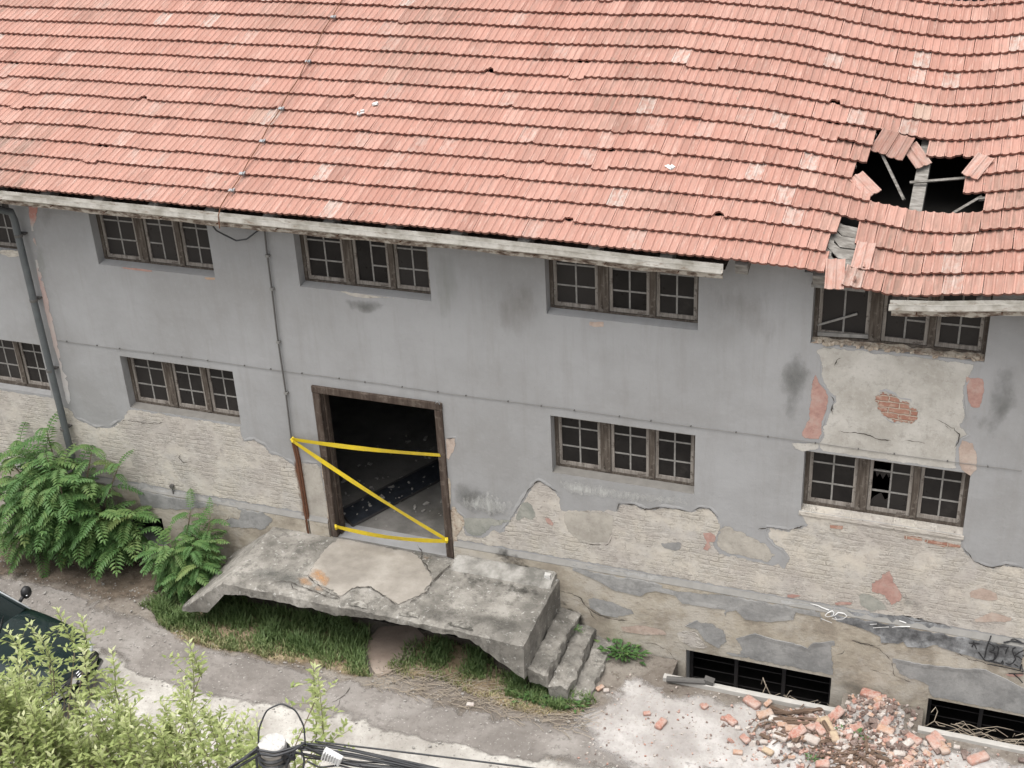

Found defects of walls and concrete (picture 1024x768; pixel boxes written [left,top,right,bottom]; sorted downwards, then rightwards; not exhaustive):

peeling [0,207,330,530]
crack [831,397,925,444]
peeling [792,347,985,476]
crack [277,544,451,604]
peeling [448,478,1024,714]